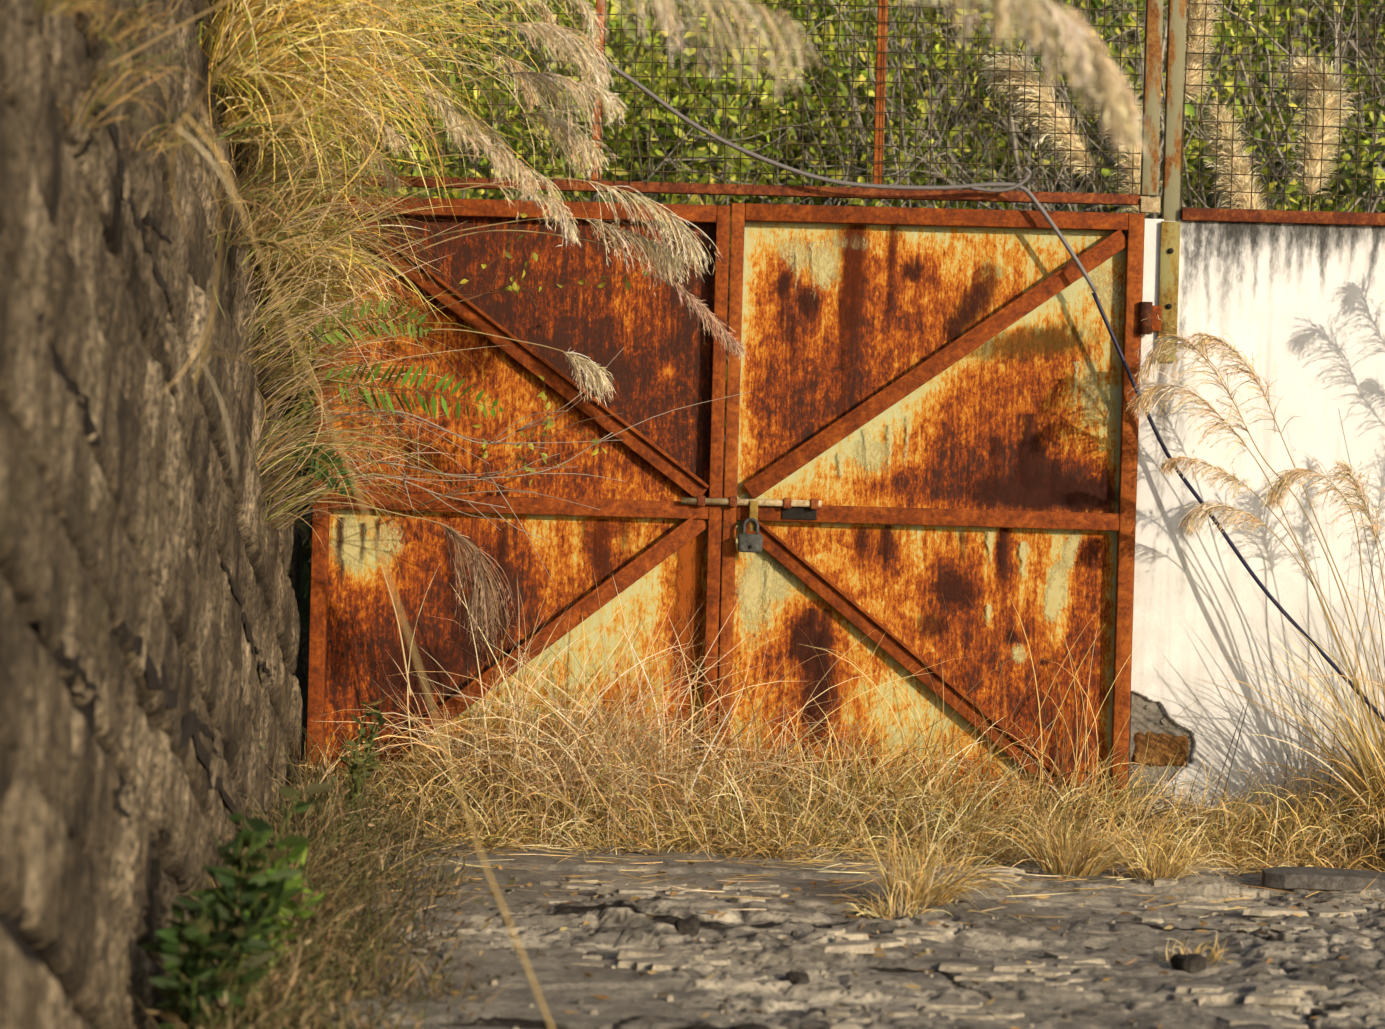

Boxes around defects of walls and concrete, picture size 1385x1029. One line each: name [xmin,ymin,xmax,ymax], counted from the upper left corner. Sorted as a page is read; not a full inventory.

rust [891,226,924,280]
water stain [1182,221,1385,273]
rust [779,275,819,355]
rust [948,265,994,339]
rust [970,414,1116,510]
rust [337,517,345,573]
rust [361,519,380,556]
rust [377,522,518,688]
rust [671,530,706,702]
rust [792,608,836,736]
spalling [1129,692,1194,804]
crack [540,899,909,929]